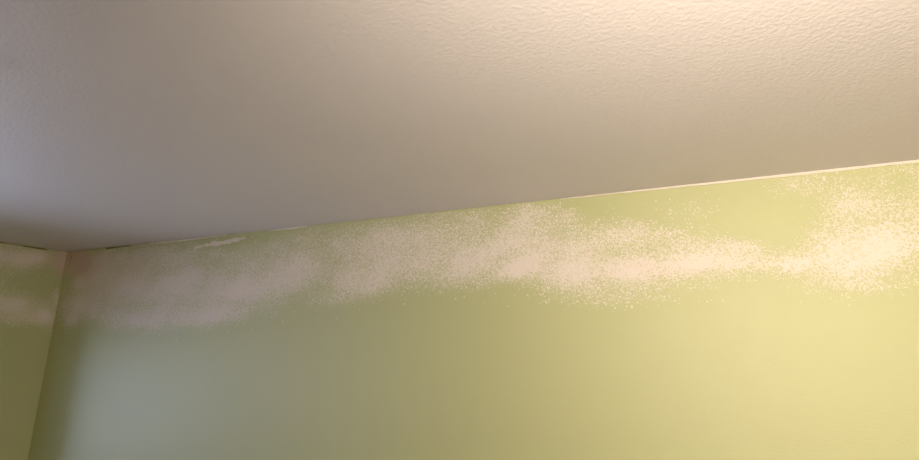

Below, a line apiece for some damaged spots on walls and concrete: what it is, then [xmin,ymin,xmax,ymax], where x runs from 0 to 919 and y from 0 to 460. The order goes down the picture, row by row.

water stain [0,240,338,337]
water stain [412,204,919,300]